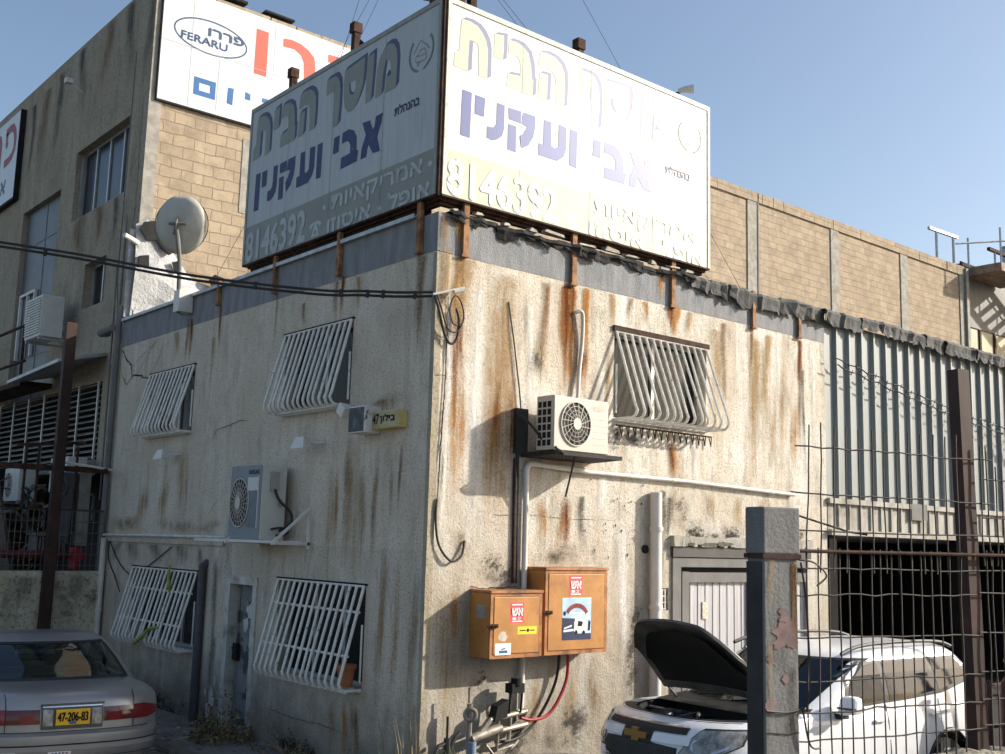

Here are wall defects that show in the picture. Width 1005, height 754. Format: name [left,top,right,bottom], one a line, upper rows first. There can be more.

crack [122,336,165,385]
corrosion [538,284,550,359]
corrosion [560,285,589,382]
corrosion [714,323,726,397]
corrosion [751,330,784,447]
leakage [619,539,642,694]
peeling [766,608,798,664]